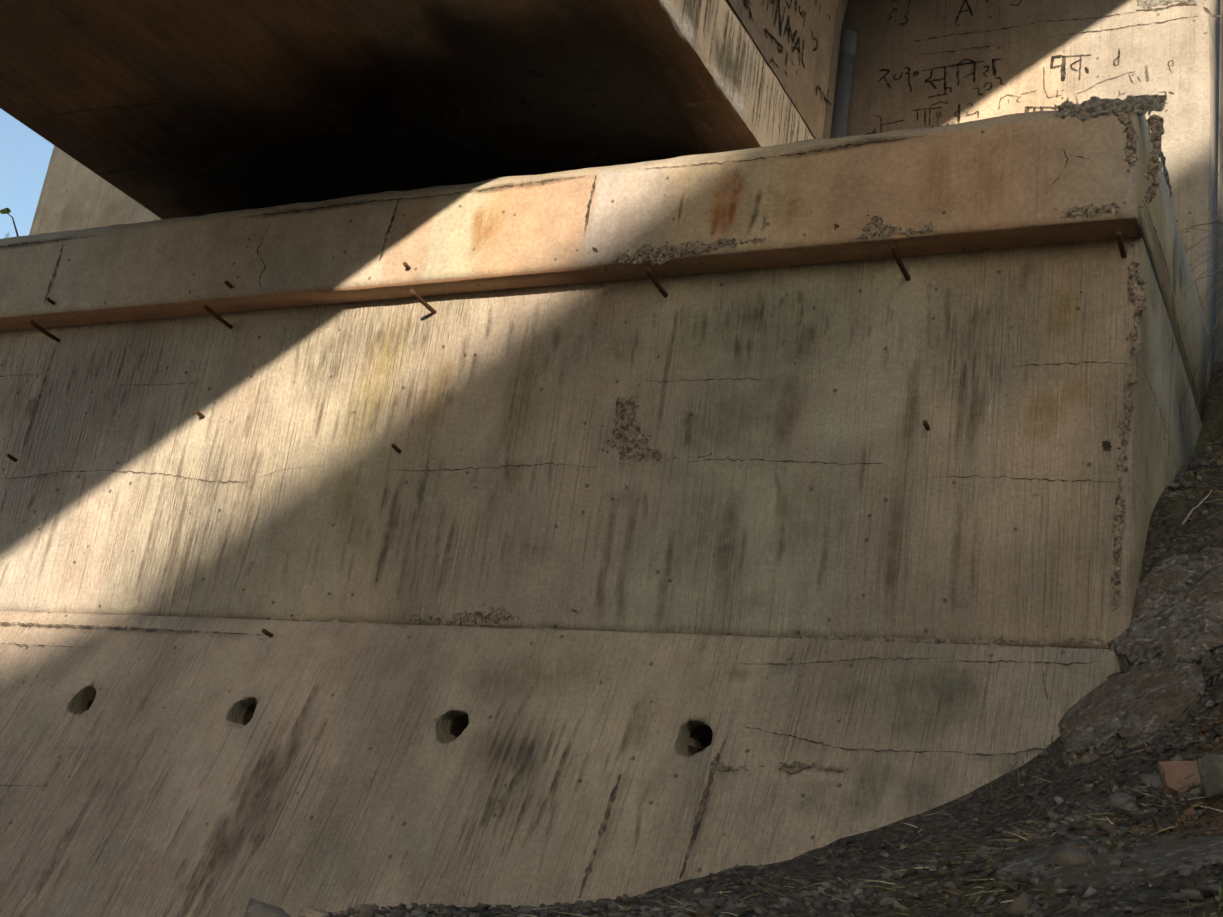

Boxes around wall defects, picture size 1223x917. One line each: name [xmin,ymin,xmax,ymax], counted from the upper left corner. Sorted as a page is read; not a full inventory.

damp [666,0,898,151]
spalling [1051,94,1172,209]
spalling [613,236,766,298]
spalling [855,216,933,281]
spalling [1060,202,1148,611]
crack [1010,200,1208,479]
crack [679,726,1050,878]